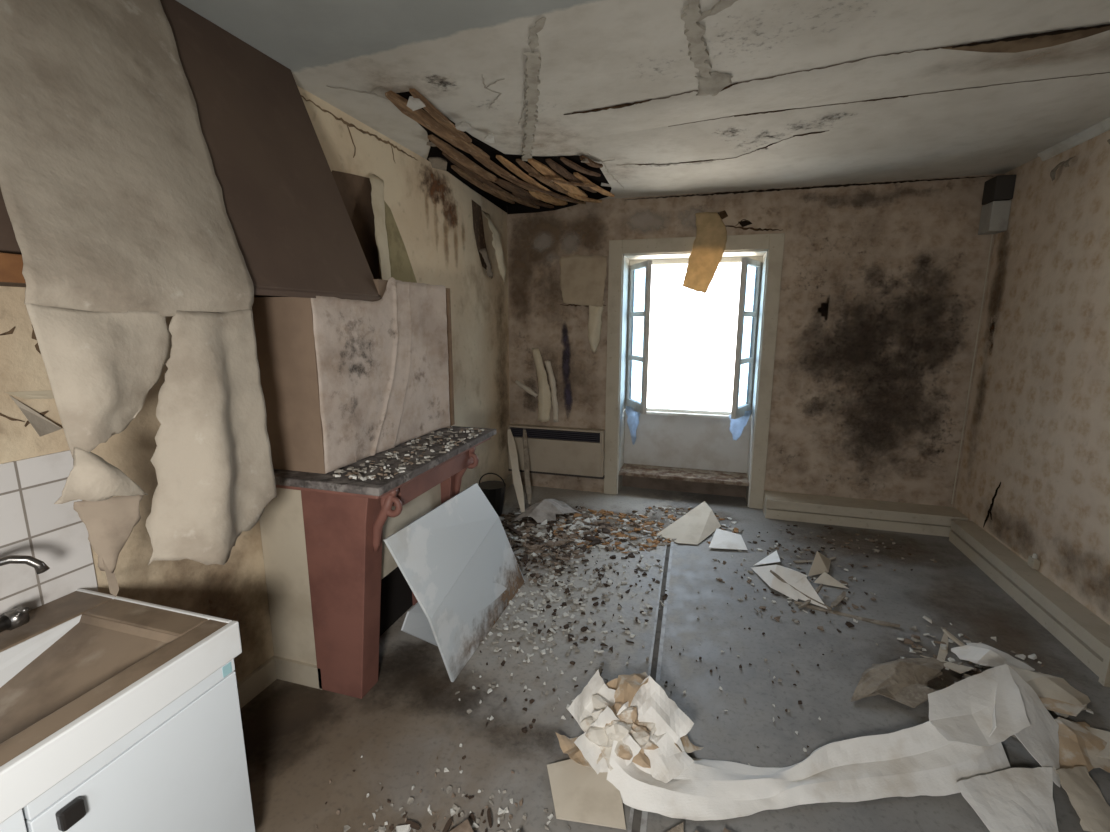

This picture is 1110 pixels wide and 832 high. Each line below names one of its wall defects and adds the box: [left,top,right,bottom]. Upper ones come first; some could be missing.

peeling [407,96,426,111]
crack [564,24,1110,165]
crack [627,176,993,231]
peeling [4,390,62,437]